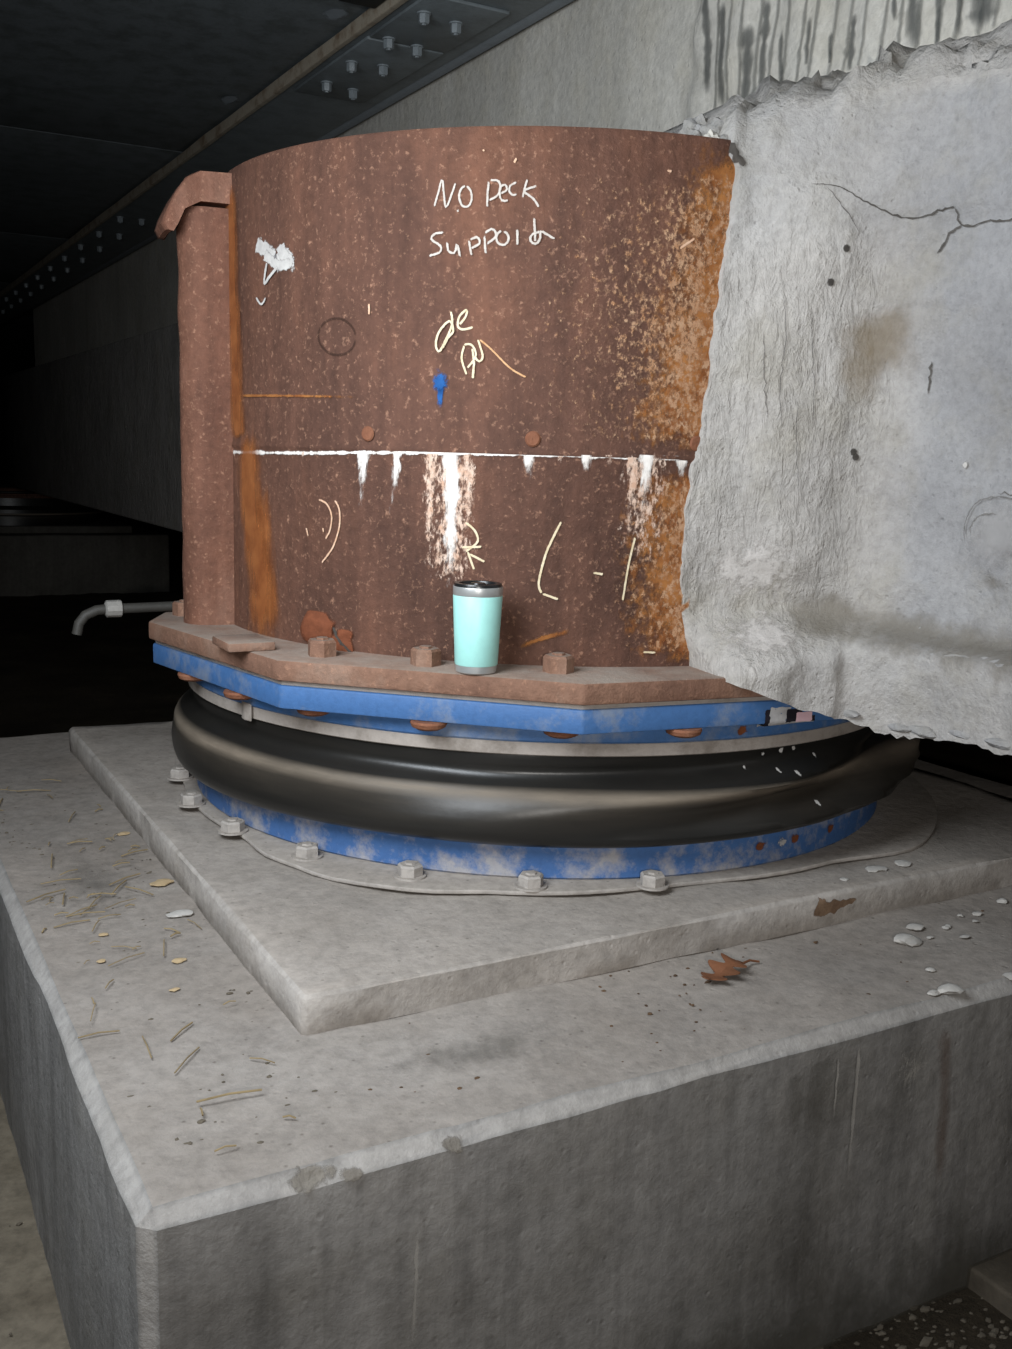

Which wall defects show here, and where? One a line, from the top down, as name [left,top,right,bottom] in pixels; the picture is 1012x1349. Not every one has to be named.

leakage [702,0,725,98]
leakage [741,5,782,99]
leakage [956,0,991,26]
crack [821,183,1012,253]
corrosion [547,161,735,449]
corrosion [225,191,341,635]
crack [926,363,934,393]
efflorescence [233,450,687,579]
corrosion [623,474,690,660]
corrosion [300,610,353,652]
spalling [289,1165,363,1194]
spalling [442,1136,463,1154]